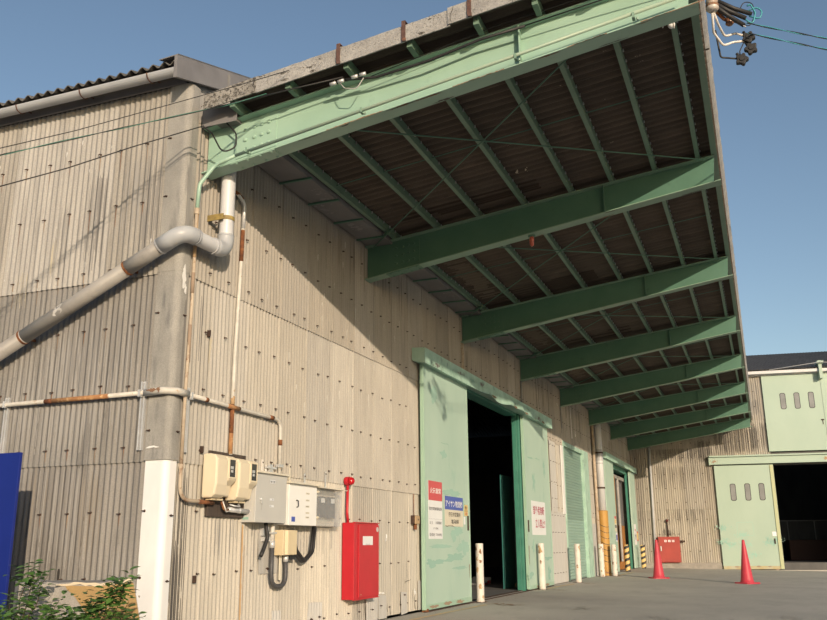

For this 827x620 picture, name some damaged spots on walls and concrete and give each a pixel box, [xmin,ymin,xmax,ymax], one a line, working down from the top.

leakage [51,149,163,279]
rust [43,388,108,406]
rust [228,396,241,454]